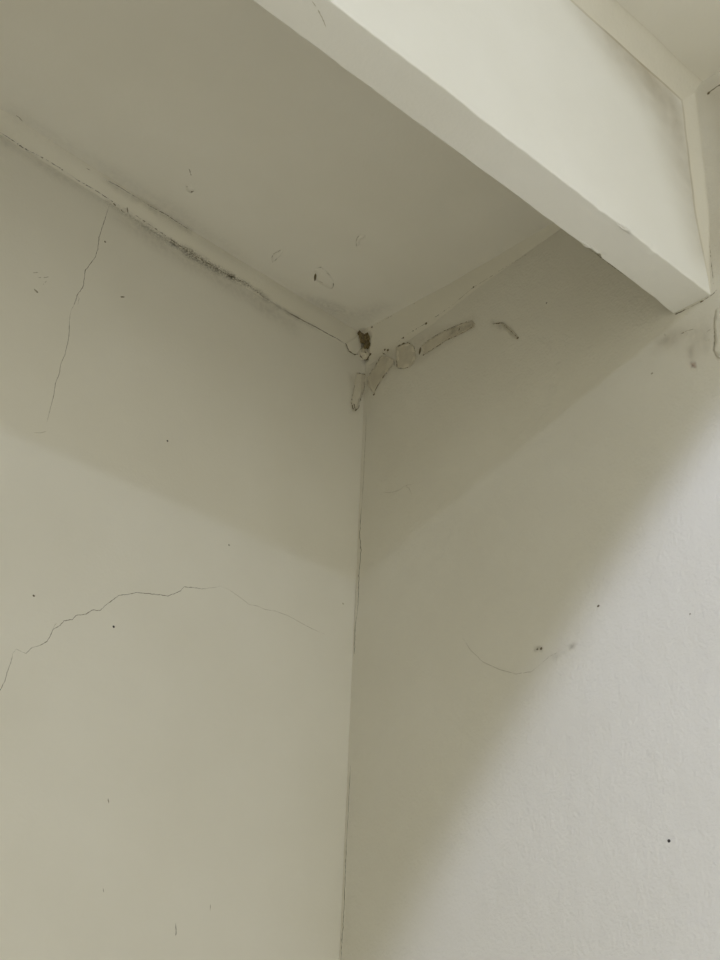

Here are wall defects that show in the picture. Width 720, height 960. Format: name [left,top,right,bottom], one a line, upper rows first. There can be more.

crack [0,116,345,433]
peeling [345,320,475,411]
crack [0,585,325,692]